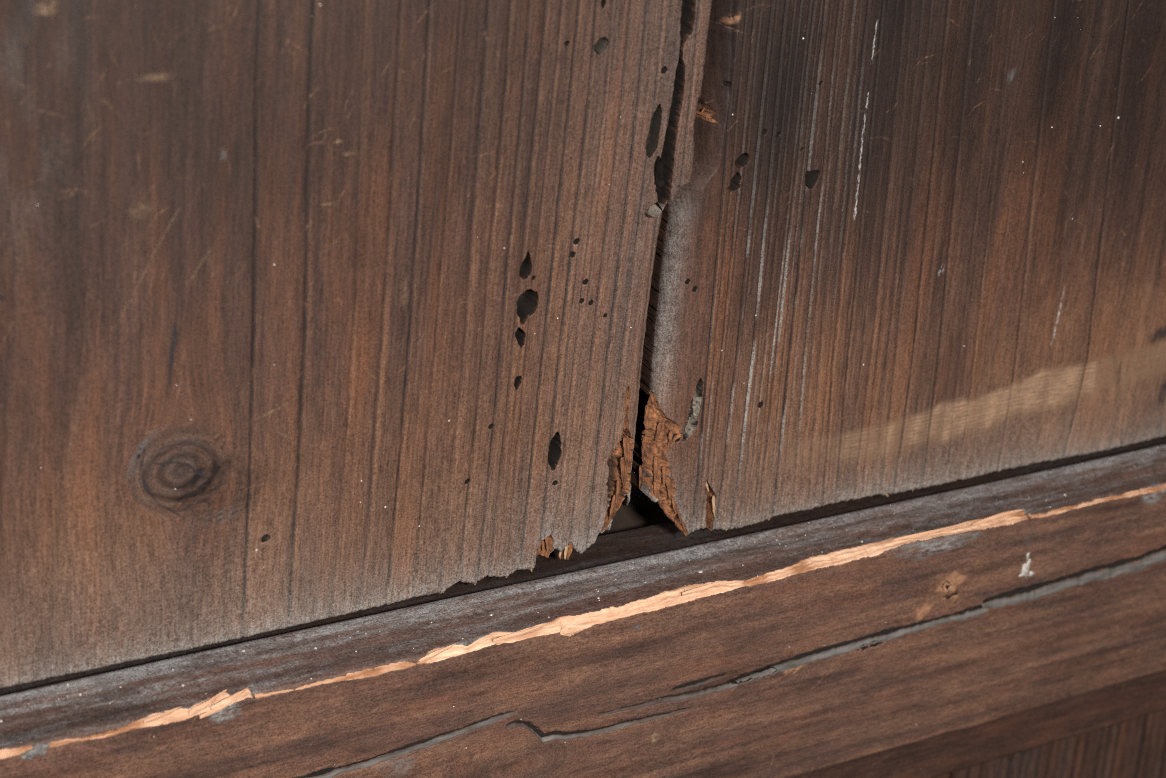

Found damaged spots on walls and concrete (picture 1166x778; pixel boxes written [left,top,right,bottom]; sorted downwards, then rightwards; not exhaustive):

peeling [609,405,686,533]
spalling [668,378,703,450]
peeling [537,535,573,560]
crack [296,545,1166,778]